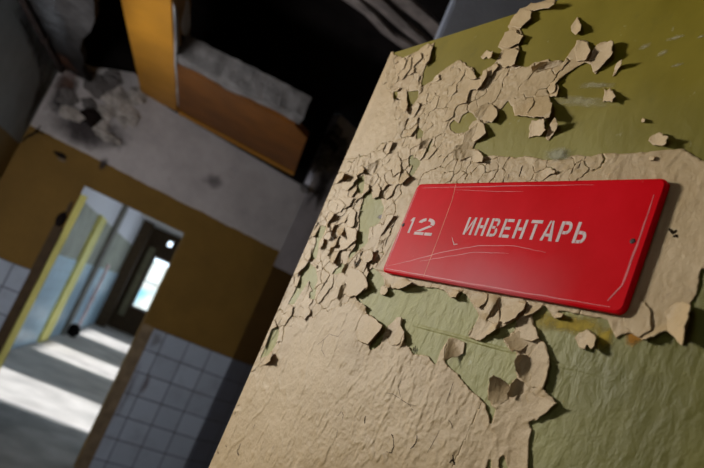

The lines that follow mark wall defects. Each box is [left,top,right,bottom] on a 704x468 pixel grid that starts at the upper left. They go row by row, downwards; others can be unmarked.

flaking render [55,69,147,146]
peeling [251,0,704,468]